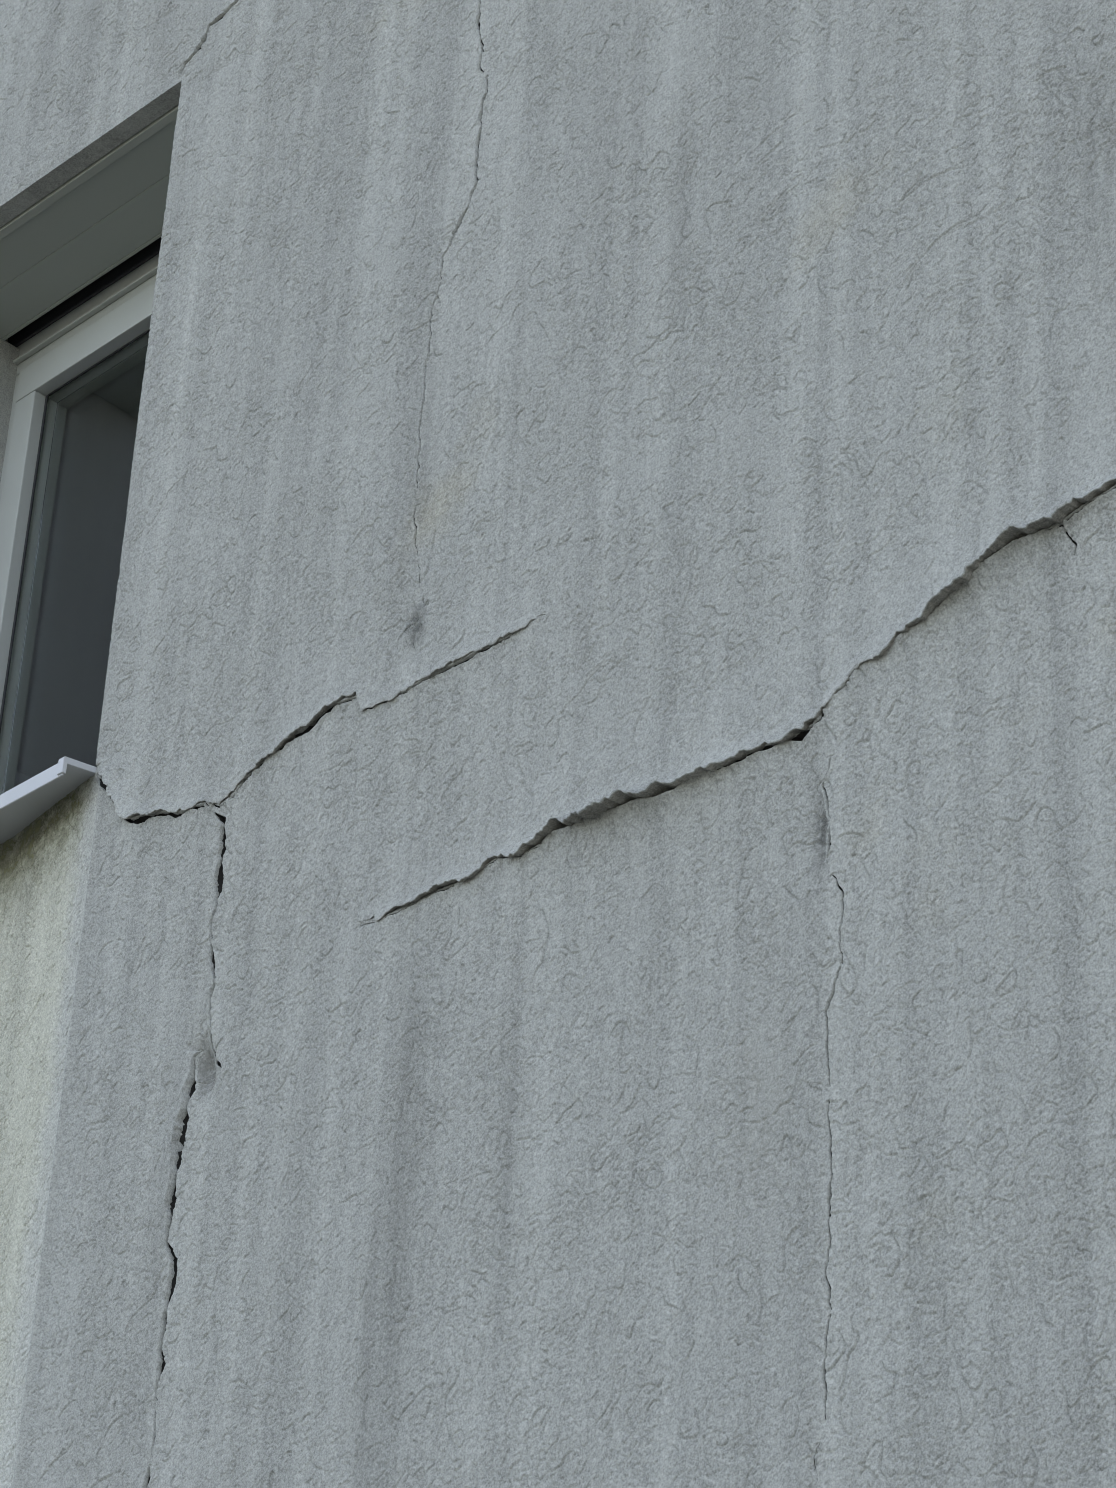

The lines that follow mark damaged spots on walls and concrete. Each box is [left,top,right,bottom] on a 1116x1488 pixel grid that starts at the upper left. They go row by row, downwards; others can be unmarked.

crack [179,0,241,77]
crack [410,0,491,589]
crack [126,802,229,1488]
crack [811,755,848,1470]